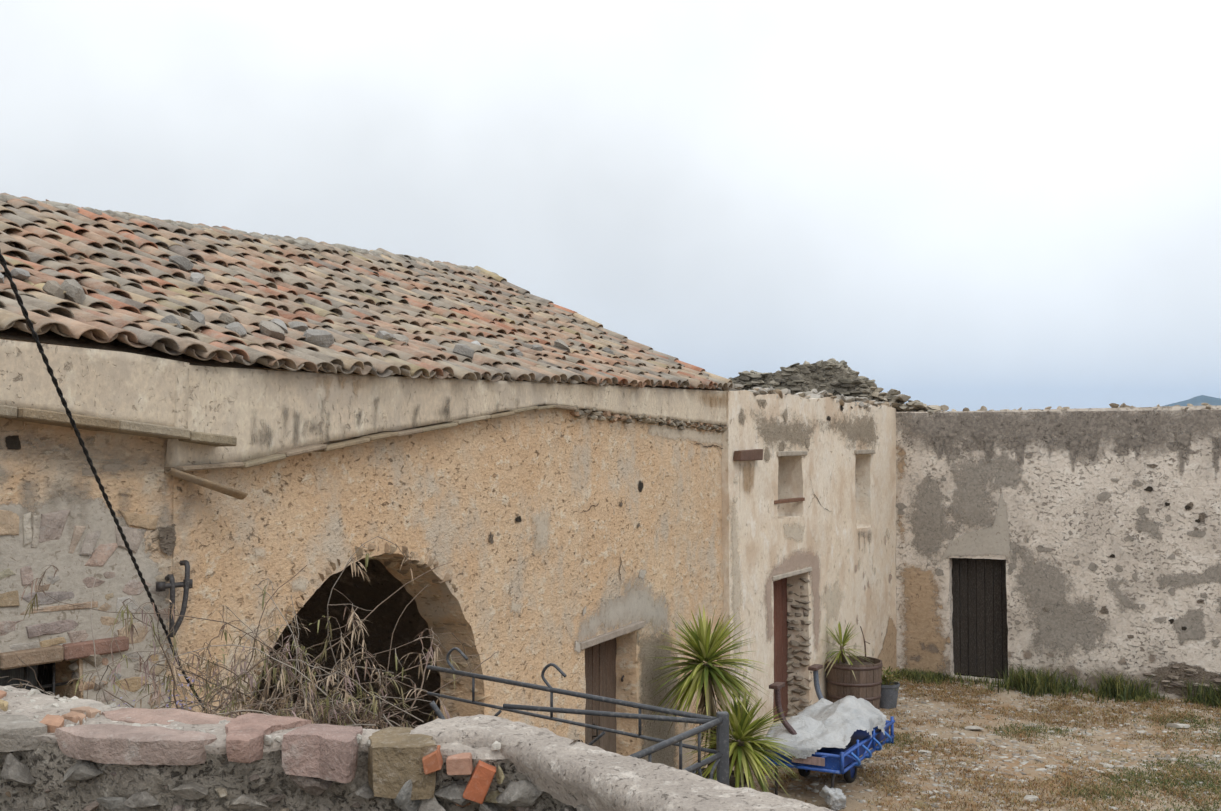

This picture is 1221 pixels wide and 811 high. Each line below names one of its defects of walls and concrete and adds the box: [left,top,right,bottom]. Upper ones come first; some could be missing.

flaking render [1097,478,1143,501]
flaking render [1124,506,1171,541]
flaking render [1187,502,1207,537]
flaking render [848,435,1030,674]
flaking render [0,492,178,733]
flaking render [1008,538,1221,658]
spalling [1143,662,1221,699]